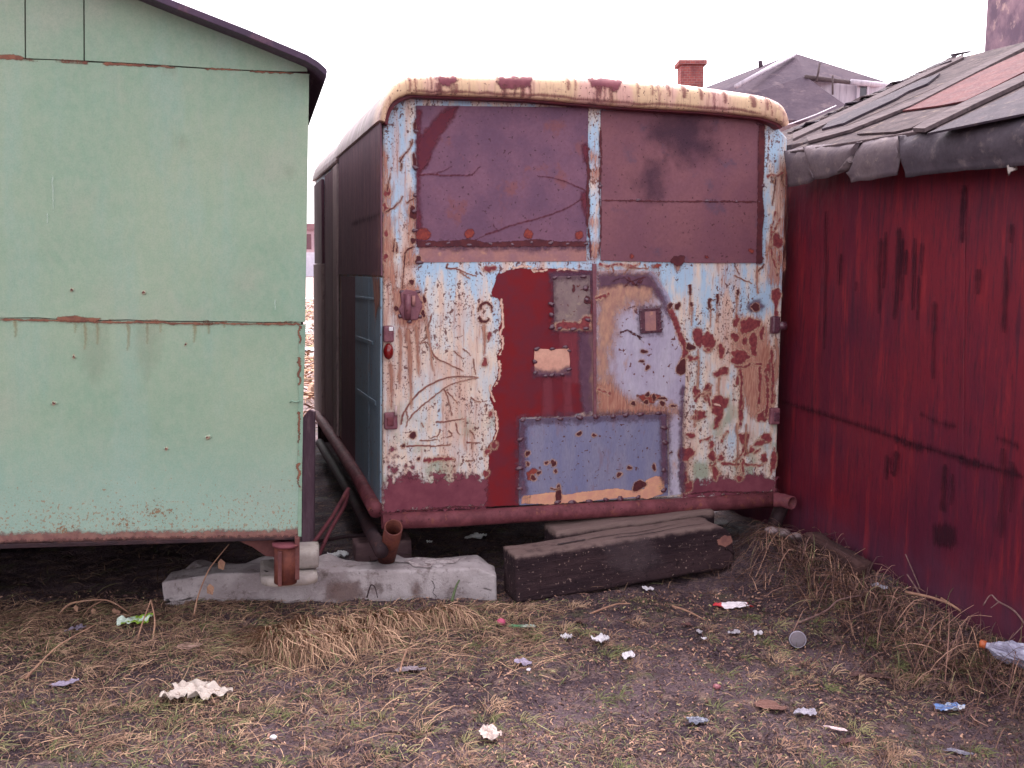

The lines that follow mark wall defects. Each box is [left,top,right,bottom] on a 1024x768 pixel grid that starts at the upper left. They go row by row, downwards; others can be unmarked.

leakage [879,229,918,316]
corrosion [0,315,302,343]
corrosion [0,498,298,543]